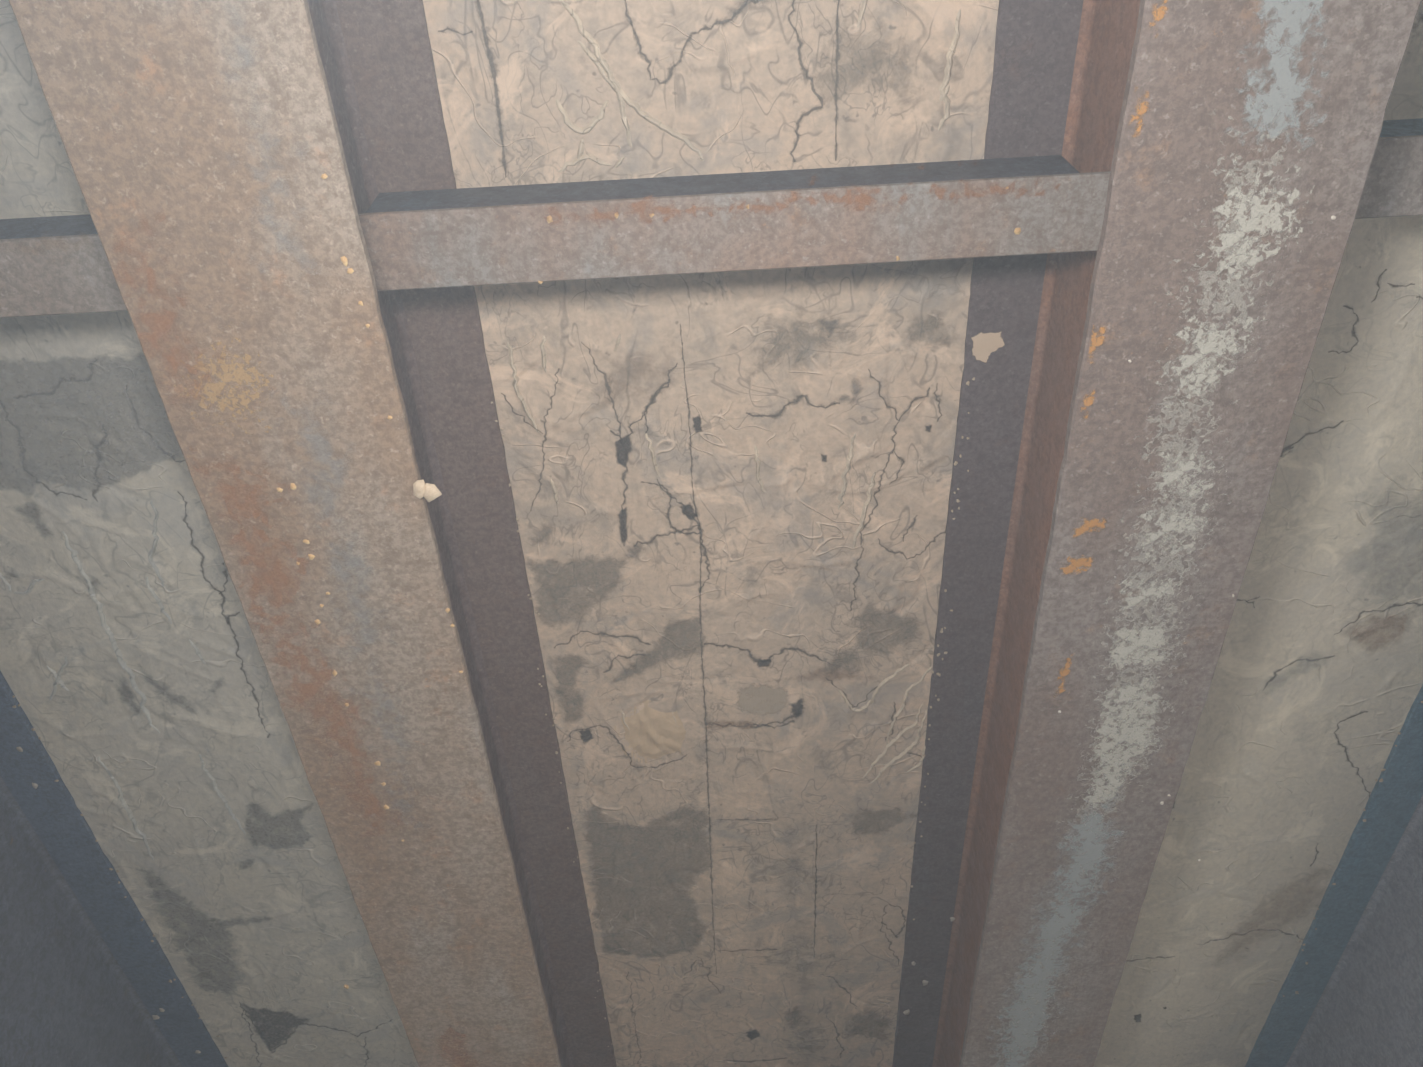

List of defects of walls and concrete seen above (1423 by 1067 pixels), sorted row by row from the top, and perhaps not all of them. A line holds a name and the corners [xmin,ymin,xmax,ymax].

crack [438,0,506,176]
crack [625,0,840,162]
spalling [971,332,1004,363]
corrosion [1089,325,1105,363]
crack [0,359,270,738]
crack [501,369,559,508]
crack [850,369,946,609]
corrosion [1060,556,1092,575]
corrosion [1073,518,1110,537]
crack [554,325,922,994]
crack [1264,602,1423,689]
damp [588,810,710,957]